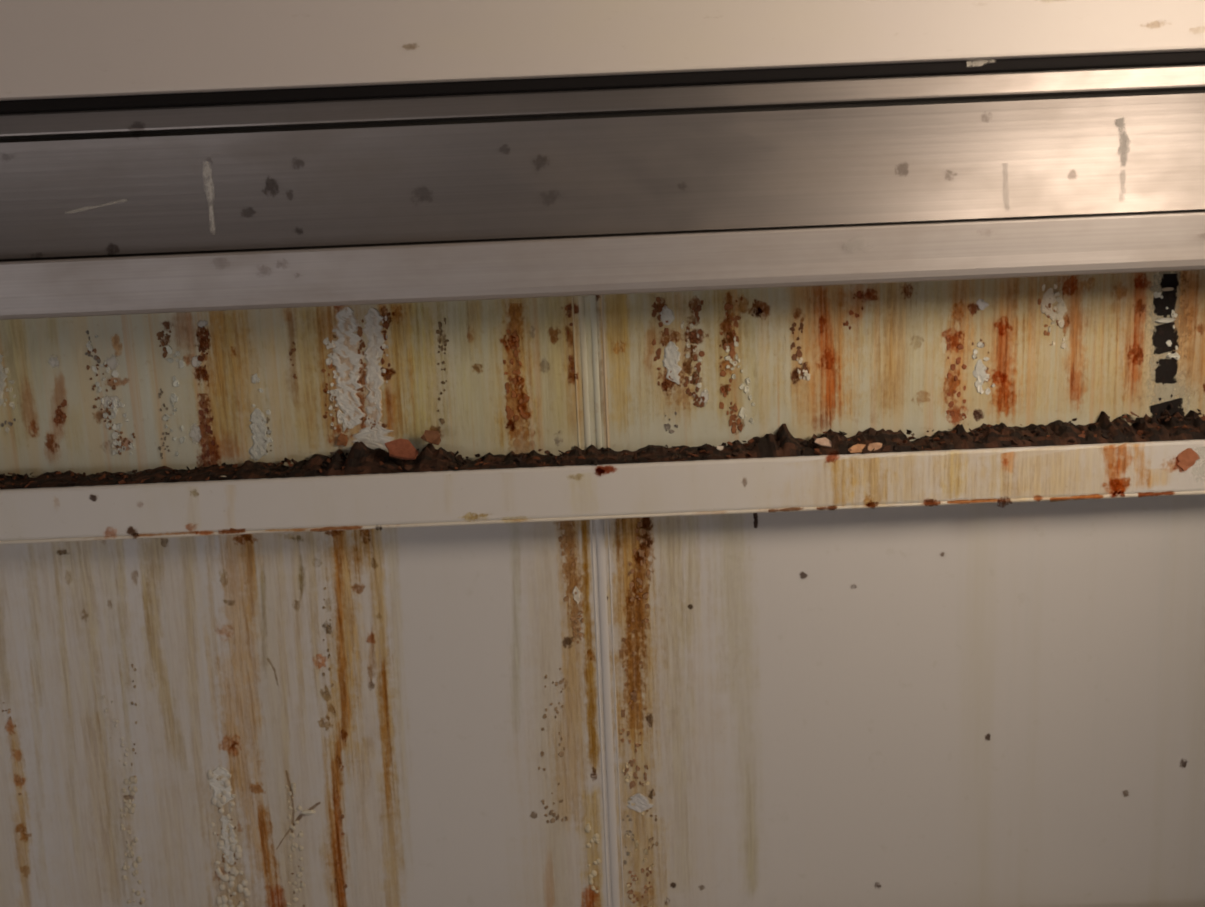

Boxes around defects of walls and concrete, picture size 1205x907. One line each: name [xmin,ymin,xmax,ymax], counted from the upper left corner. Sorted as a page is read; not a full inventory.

rust [47,400,67,450]
rust [189,321,219,467]
rust [380,307,396,380]
rust [421,318,449,445]
rust [500,329,530,431]
rust [595,465,616,476]
rust [651,297,769,434]
rust [790,311,811,384]
rust [946,332,967,420]
rust [1149,271,1190,419]
rust [563,586,584,646]
rust [620,517,658,907]